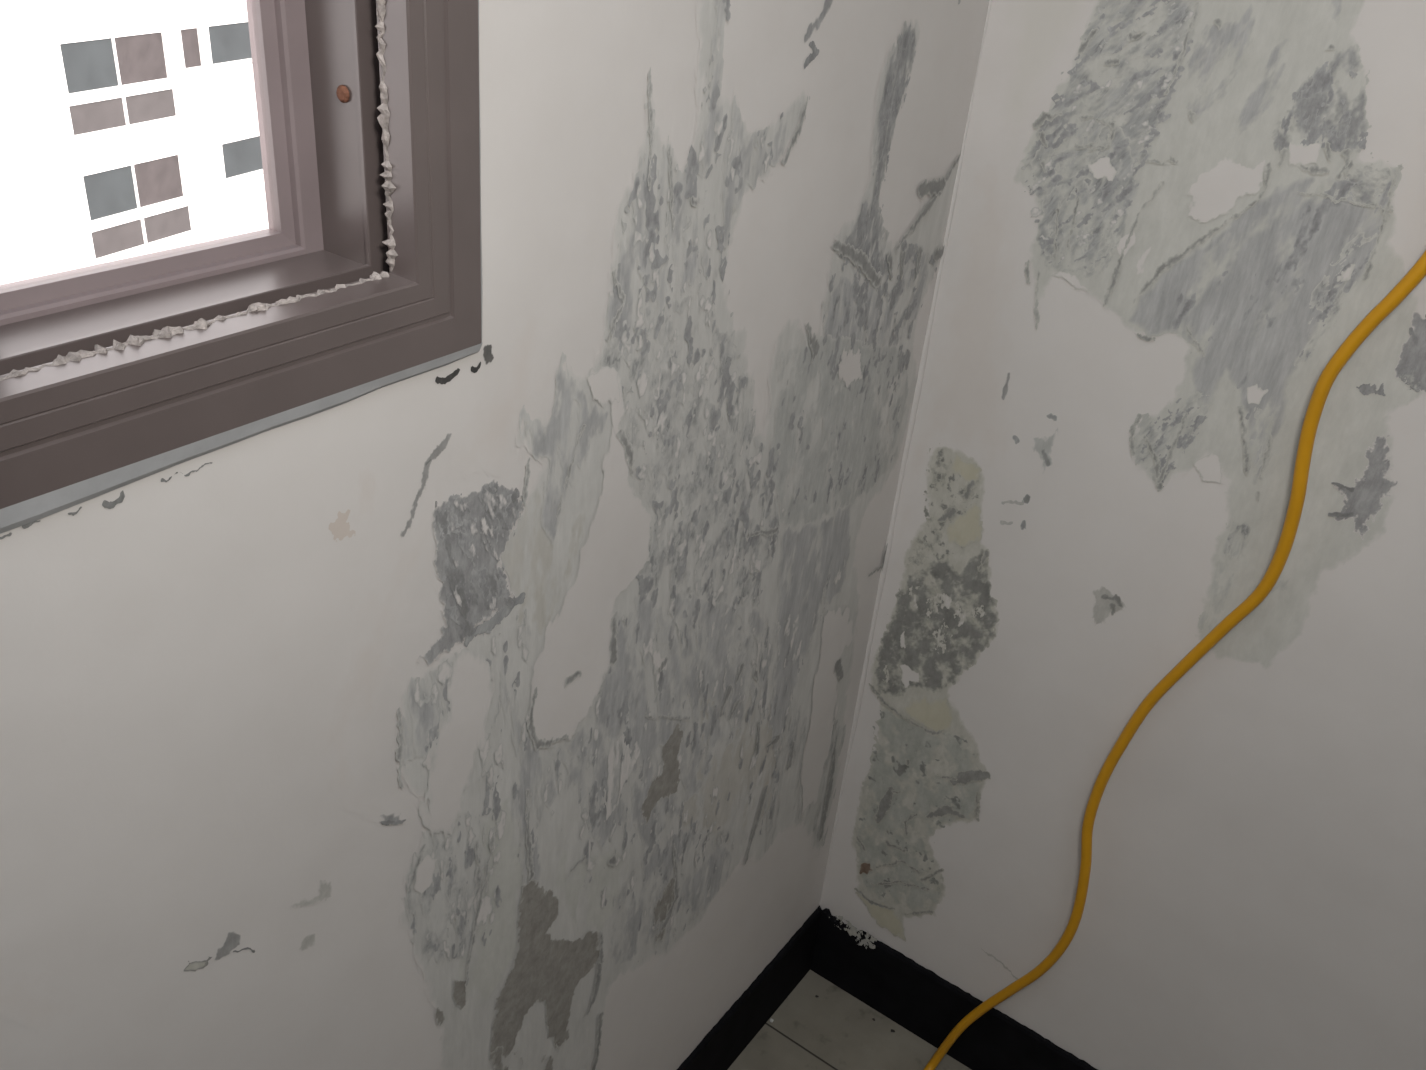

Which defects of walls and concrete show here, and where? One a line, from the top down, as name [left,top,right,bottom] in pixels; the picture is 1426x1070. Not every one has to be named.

peeling [379,0,961,1070]
peeling [1000,494,1030,530]
peeling [1012,0,1426,670]
peeling [184,931,255,971]